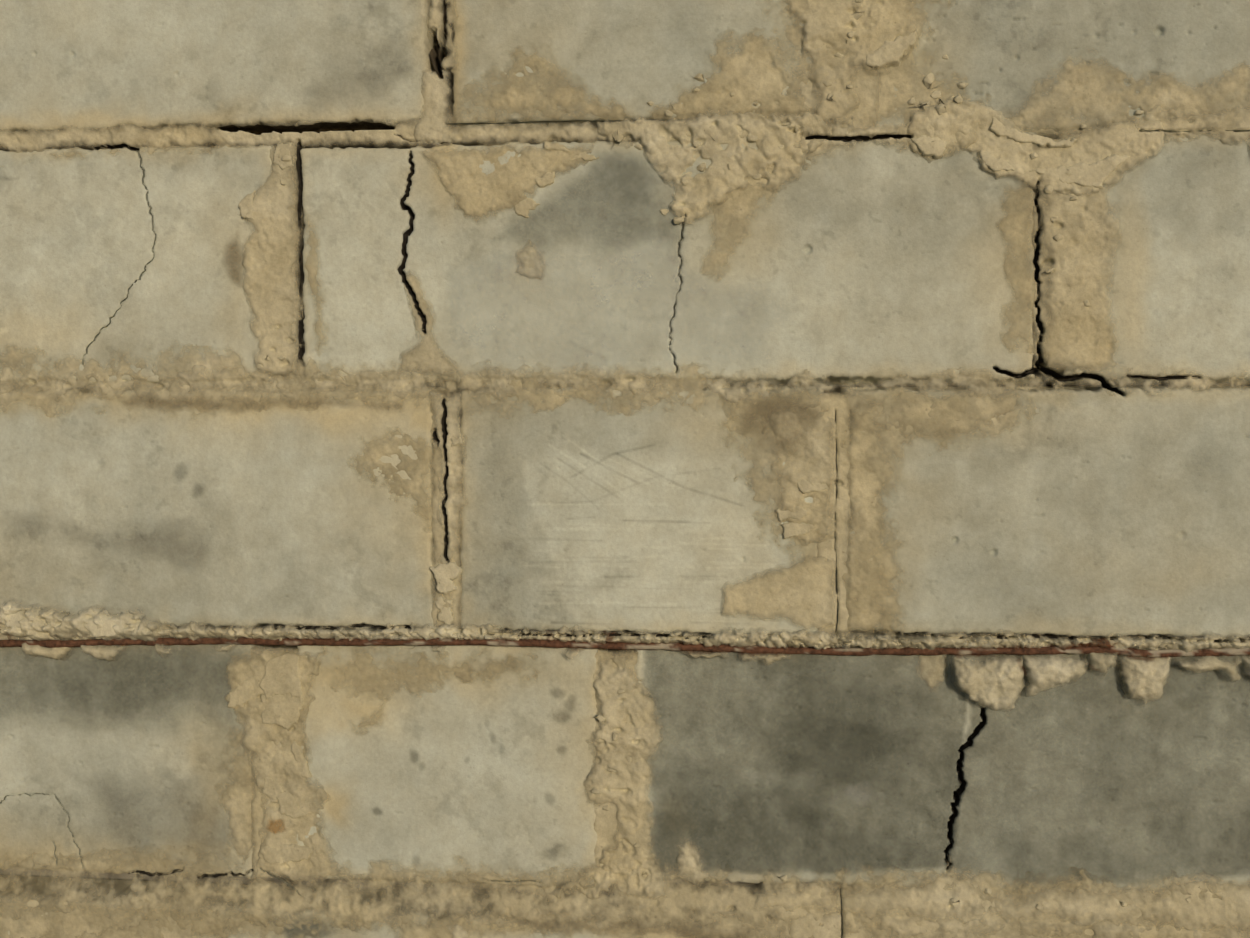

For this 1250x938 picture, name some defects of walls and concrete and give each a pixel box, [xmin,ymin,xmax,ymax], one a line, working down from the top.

peeling [238,142,300,374]
crack [296,141,305,359]
crack [397,153,427,333]
peeling [598,0,1250,371]
crack [993,181,1199,395]
crack [433,399,449,561]
peeling [651,405,1041,650]
rust [1060,638,1112,651]
peeling [225,630,350,881]
peeling [557,635,665,899]
crack [945,706,986,869]
peeling [760,868,1250,930]